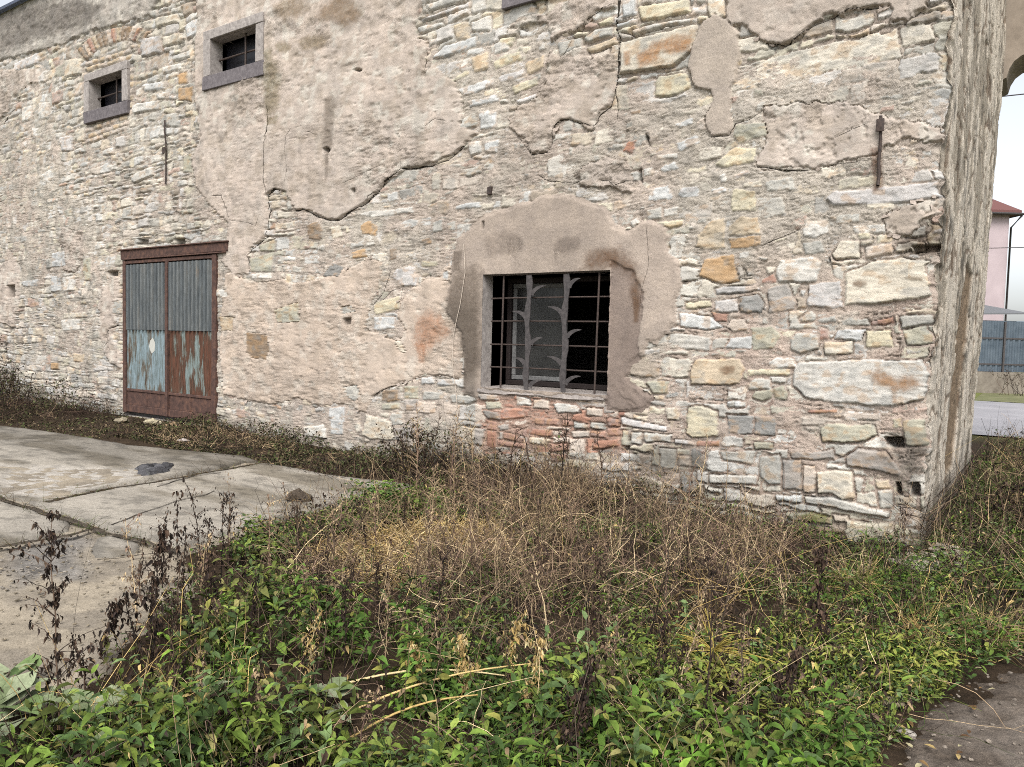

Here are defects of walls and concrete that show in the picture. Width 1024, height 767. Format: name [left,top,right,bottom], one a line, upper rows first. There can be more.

crack [519,0,635,186]
crack [213,106,464,273]
flaking render [0,0,954,552]